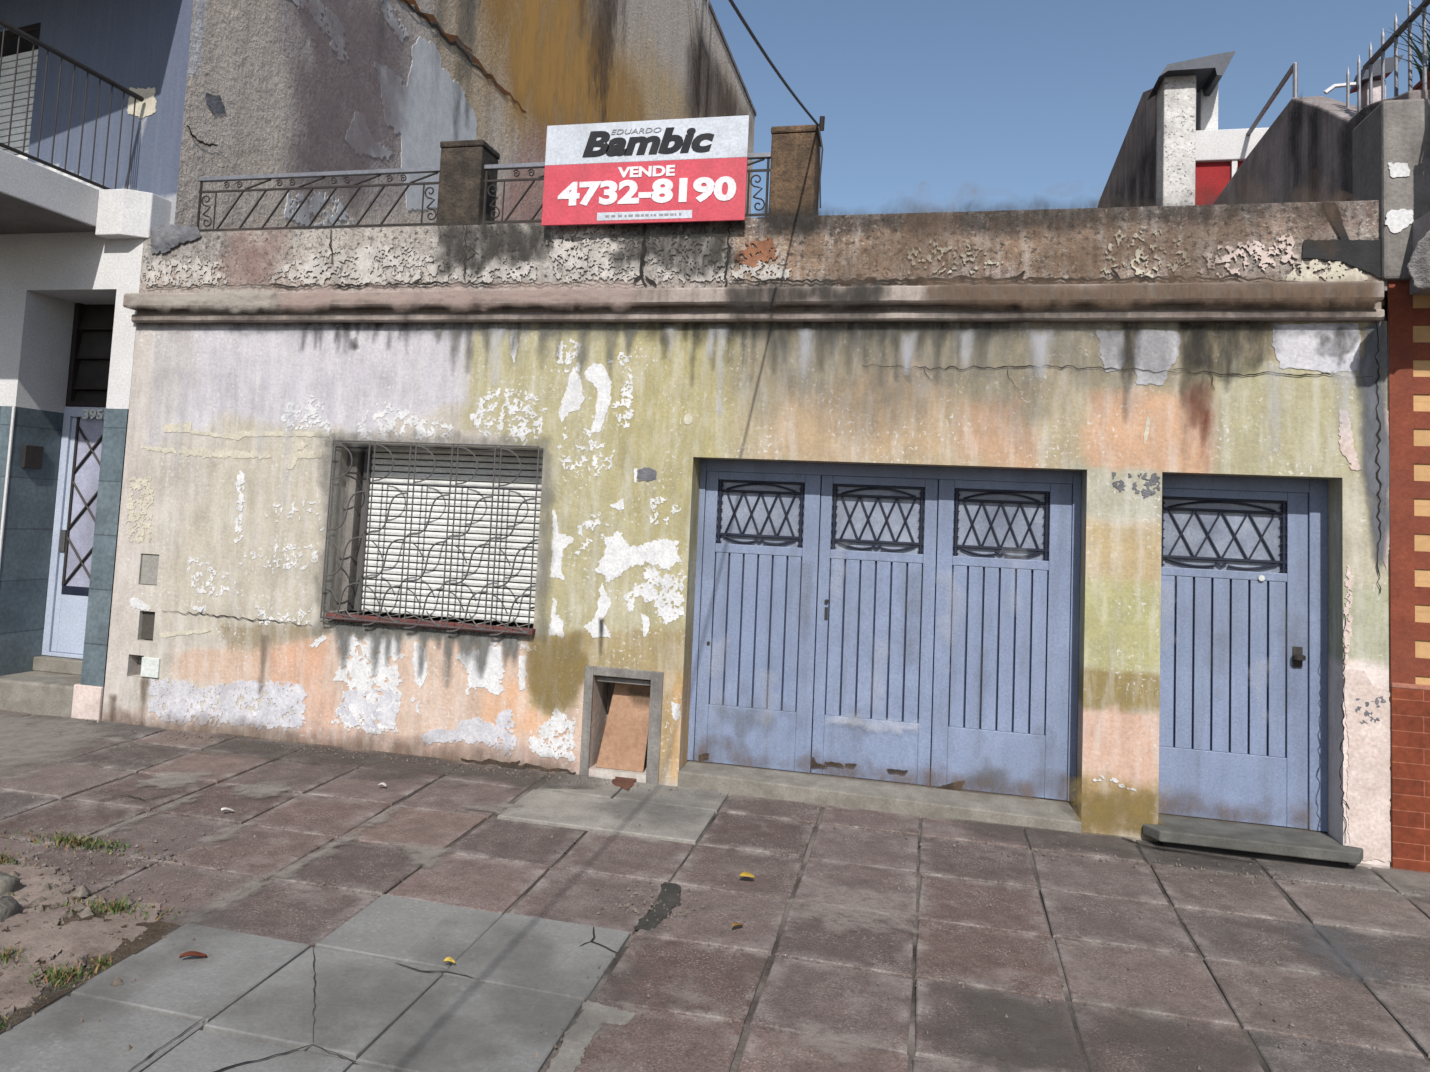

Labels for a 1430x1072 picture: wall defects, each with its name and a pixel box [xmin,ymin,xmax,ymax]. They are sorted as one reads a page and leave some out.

crack [400,0,526,113]
peeling [130,224,792,308]
leakage [613,221,746,274]
leakage [928,261,1375,305]
peeling [1100,229,1368,282]
spalling [1385,209,1430,289]
leakage [1359,320,1390,563]
peeling [548,496,687,639]
leakage [318,551,585,700]
peeling [420,637,576,763]
crack [128,1016,207,1072]
crack [213,945,356,1072]